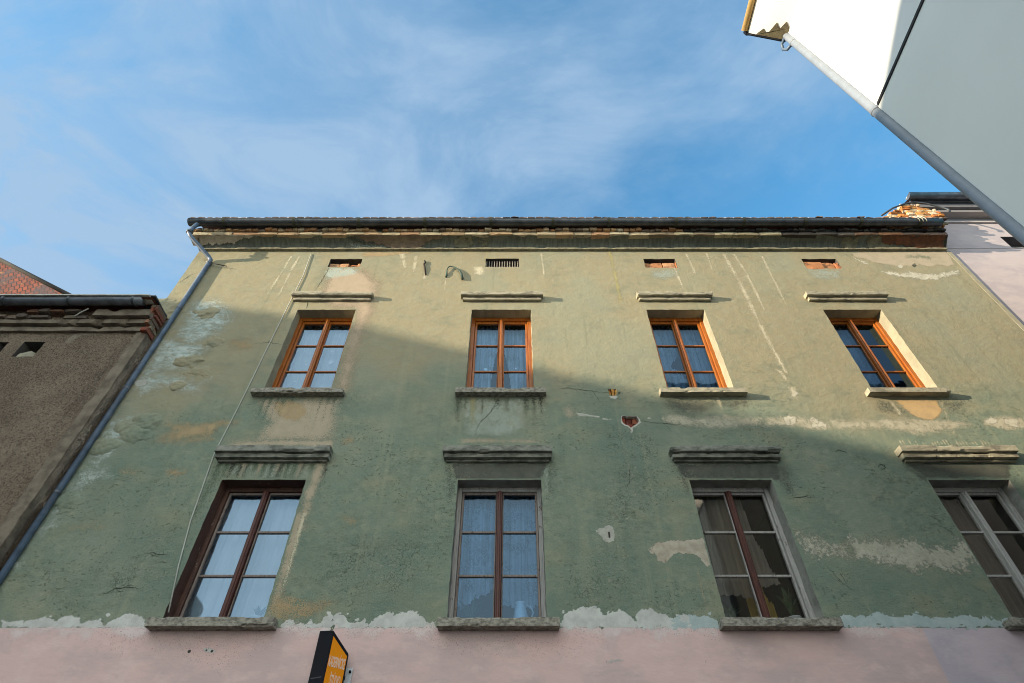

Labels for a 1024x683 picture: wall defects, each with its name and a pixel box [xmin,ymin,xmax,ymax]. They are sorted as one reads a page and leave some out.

water stain [722,253,798,400]
flaking render [621,415,641,433]
peeling [596,525,615,543]
peeling [648,538,711,567]
peeling [793,529,979,576]
peeling [280,610,436,630]
peeling [560,606,720,631]
peeling [840,611,1008,630]